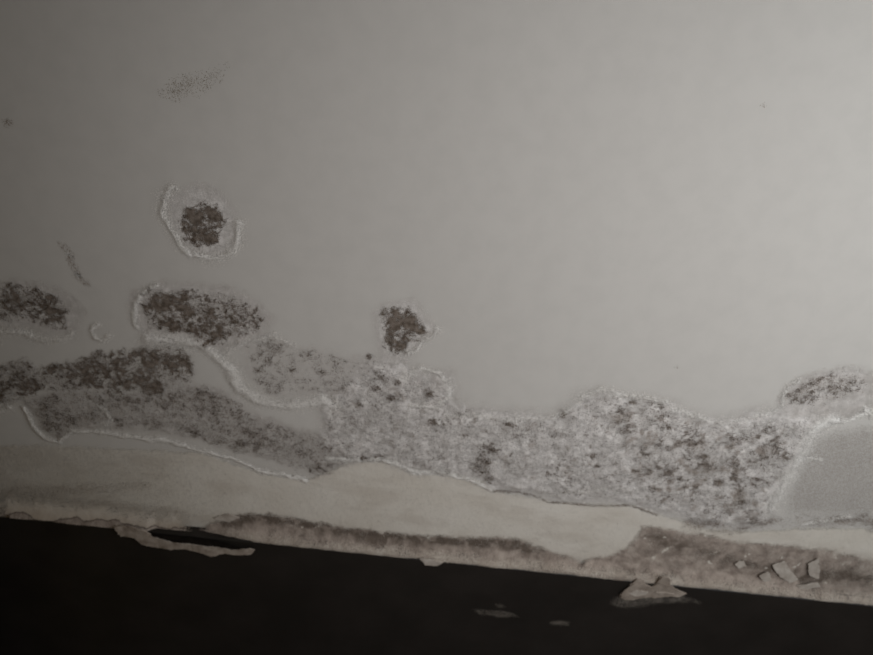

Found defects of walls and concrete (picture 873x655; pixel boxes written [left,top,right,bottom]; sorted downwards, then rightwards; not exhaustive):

water stain [150,180,250,269]
water stain [0,277,873,534]
peeling [0,488,873,608]